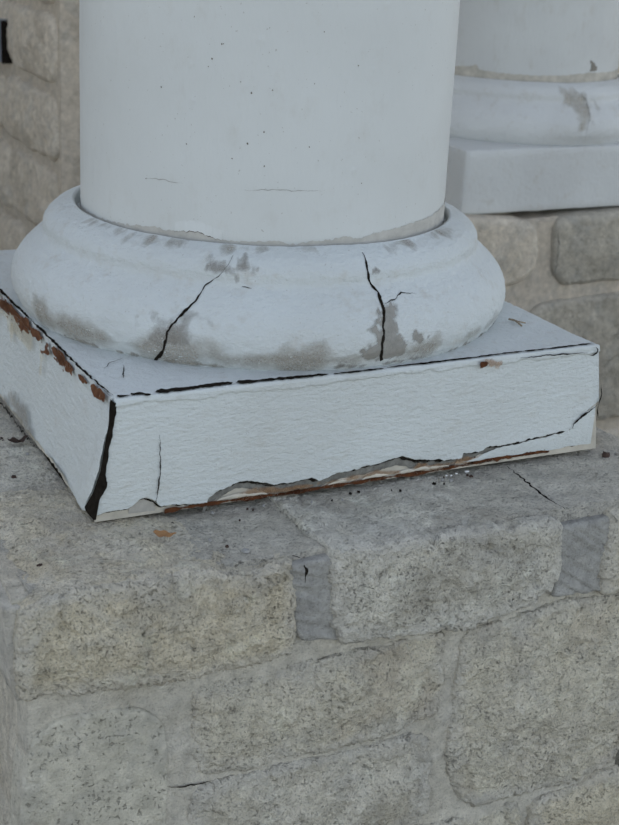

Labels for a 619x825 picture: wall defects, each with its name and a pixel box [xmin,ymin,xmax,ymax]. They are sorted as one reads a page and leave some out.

corrosion [0,291,105,402]
crack [0,252,602,520]
corrosion [164,449,549,514]
spalling [203,406,595,512]